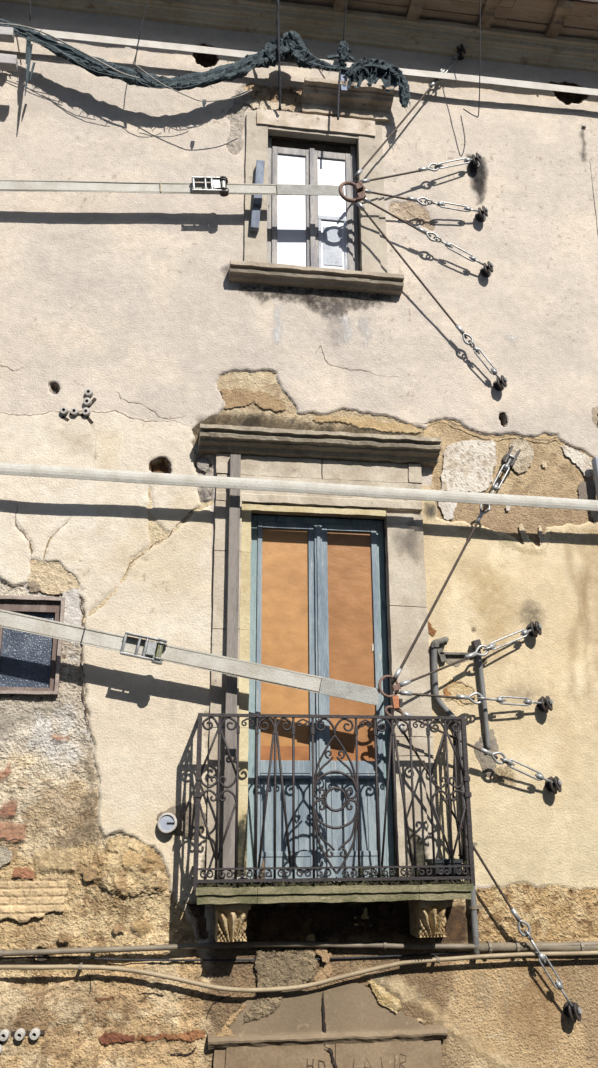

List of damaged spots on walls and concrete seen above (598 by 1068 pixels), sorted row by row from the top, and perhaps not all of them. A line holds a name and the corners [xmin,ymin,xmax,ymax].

flaking render [225,82,302,155]
spalling [549,81,588,105]
damp [240,285,390,343]
crack [1,391,186,425]
damp [245,414,260,427]
flaking render [192,371,598,553]
crack [14,512,68,564]
crack [80,487,213,726]
flaking render [0,640,208,990]
flaking render [476,882,598,943]
flaking render [98,1004,247,1045]
crack [322,991,338,1068]